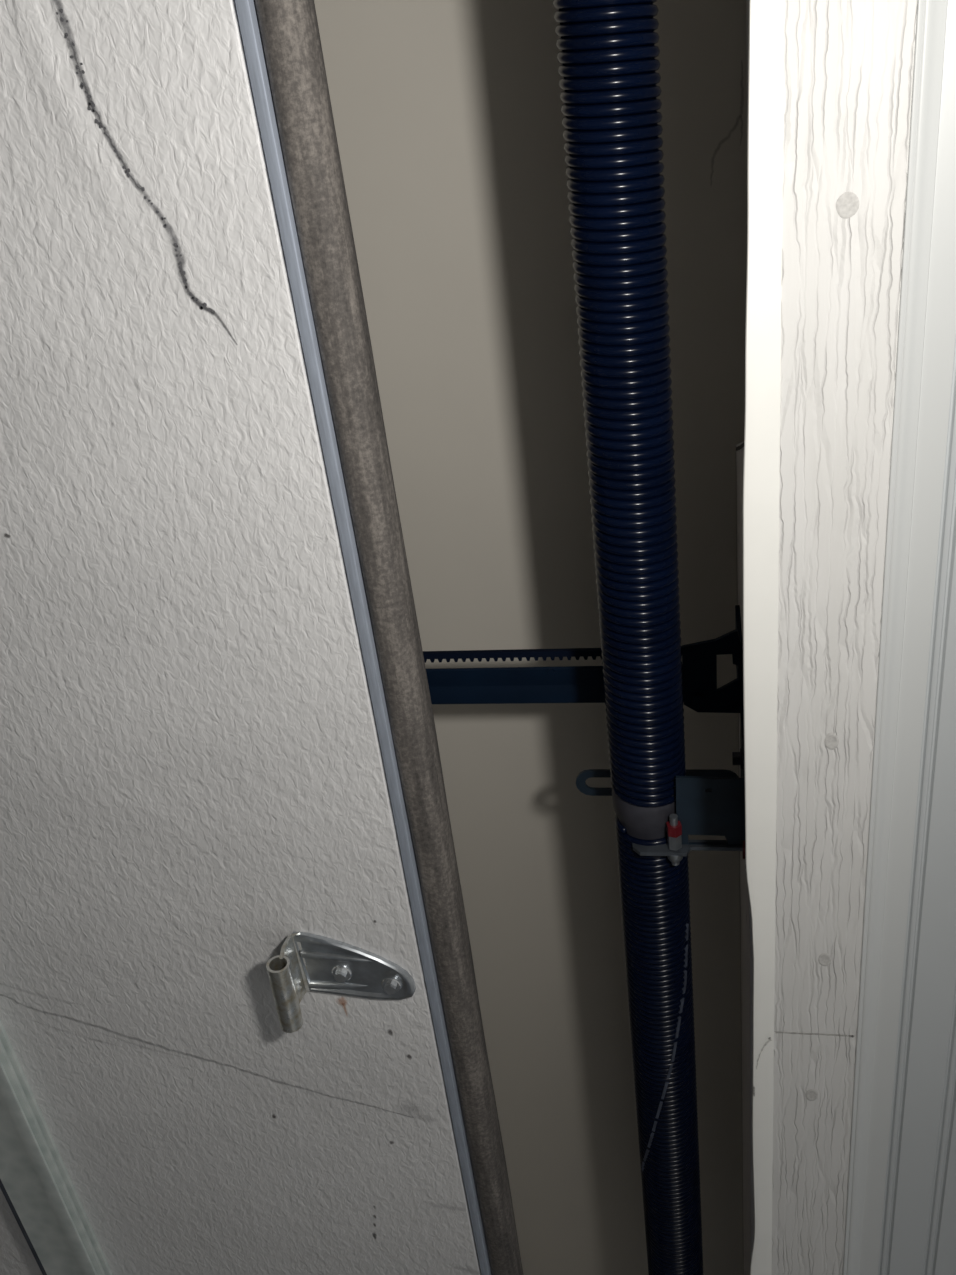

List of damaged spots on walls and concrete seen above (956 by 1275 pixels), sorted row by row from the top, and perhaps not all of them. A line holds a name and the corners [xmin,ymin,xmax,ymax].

crack [54,0,237,344]